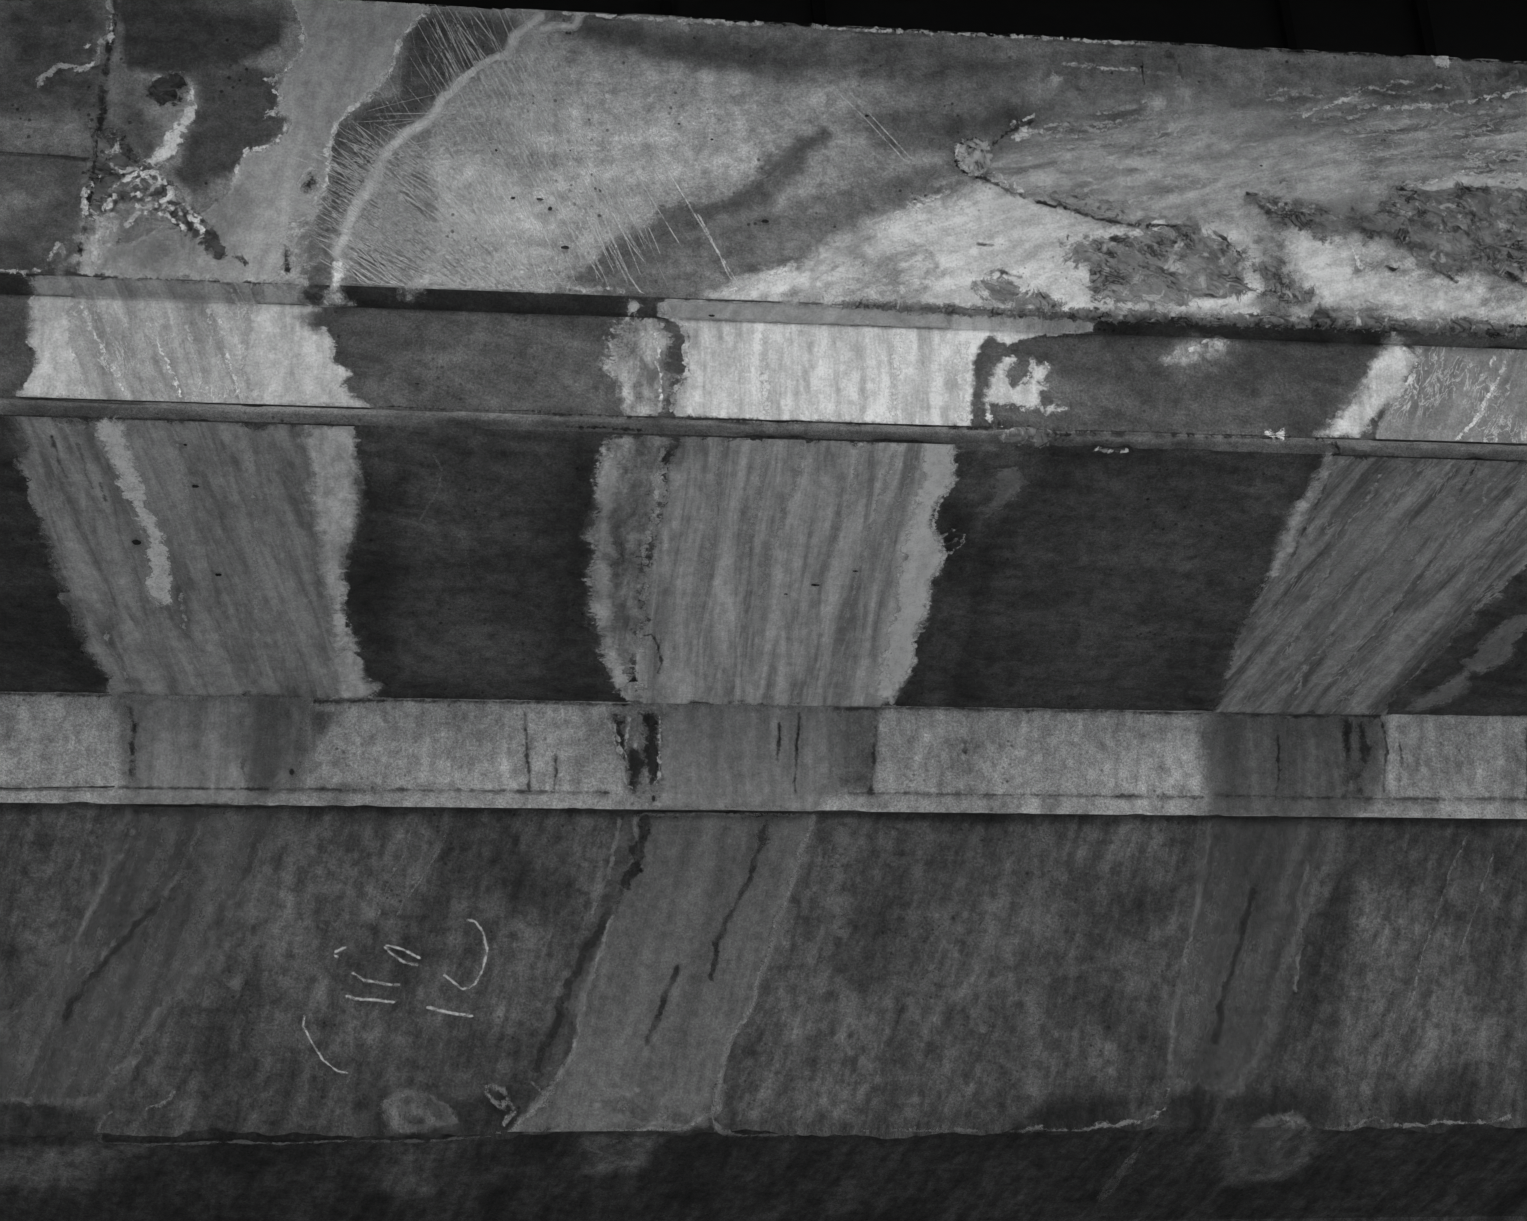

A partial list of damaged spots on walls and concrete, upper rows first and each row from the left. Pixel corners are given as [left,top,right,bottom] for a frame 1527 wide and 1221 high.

crack [0,0,118,272]
spalling [79,120,249,267]
damp [0,0,581,408]
spalling [841,216,1527,340]
spalling [1244,179,1527,285]
damp [545,50,1527,1133]
damp [0,416,378,1104]
damp [371,435,966,1161]
damp [109,1139,351,1147]